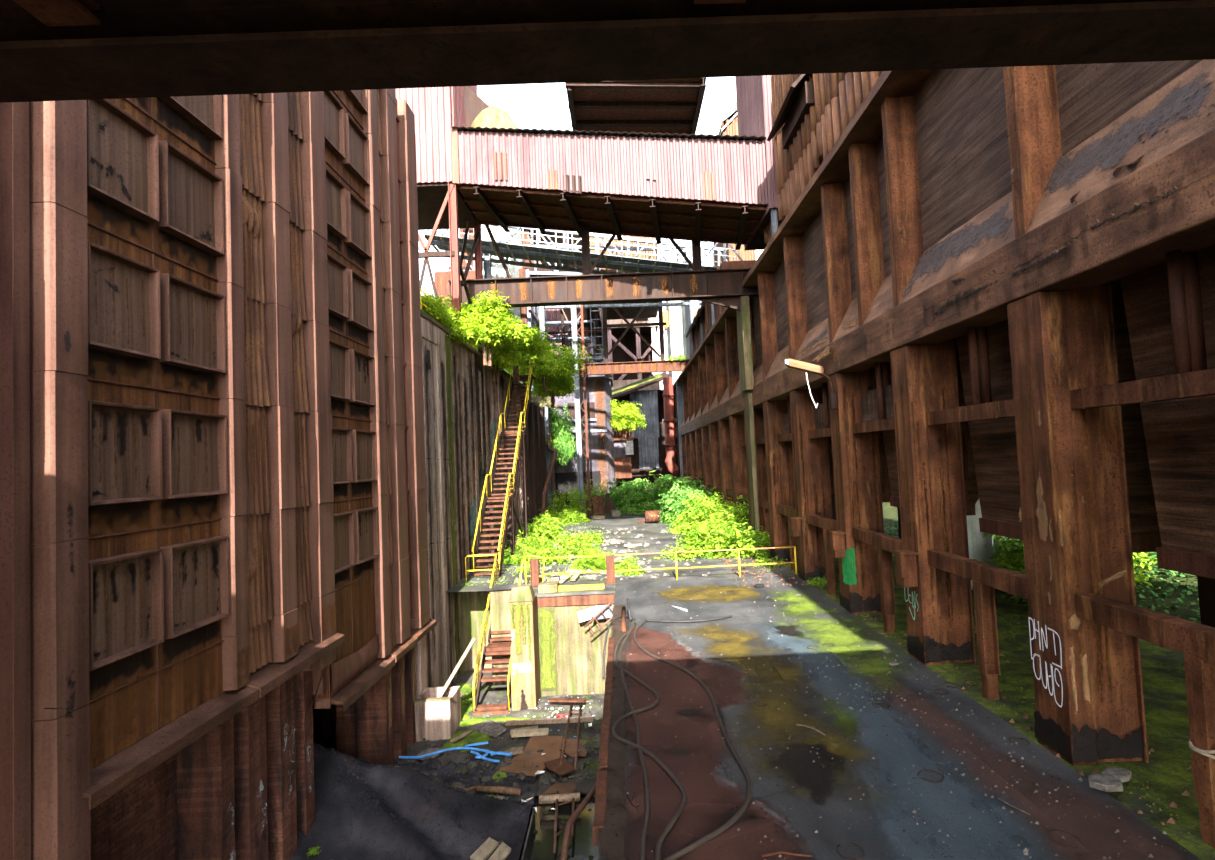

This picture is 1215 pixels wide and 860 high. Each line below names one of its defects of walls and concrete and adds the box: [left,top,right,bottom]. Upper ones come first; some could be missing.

peeling [1044,72,1215,203]
peeling [903,203,1014,297]
spalling [935,278,997,315]
leakage [760,624,1183,860]